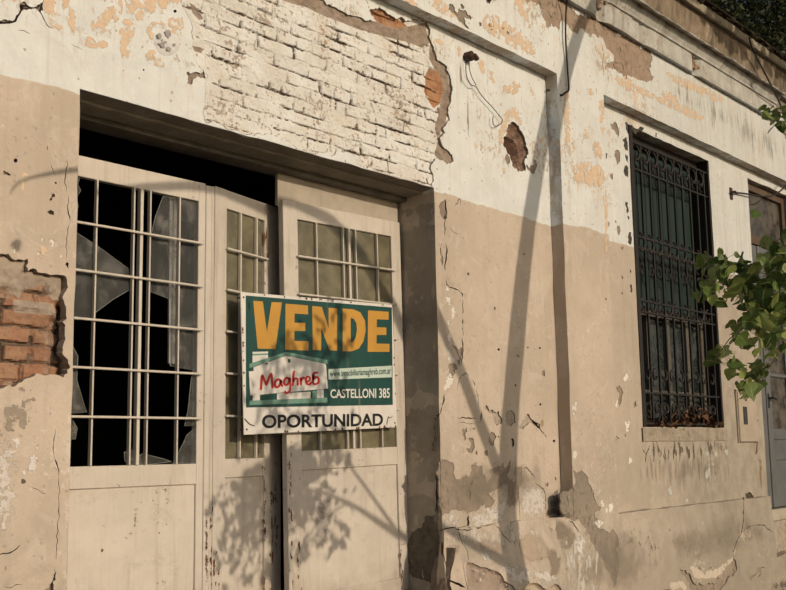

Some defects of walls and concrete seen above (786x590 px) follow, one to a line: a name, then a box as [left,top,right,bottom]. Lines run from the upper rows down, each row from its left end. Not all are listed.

crack [0,0,51,34]
flaking render [85,0,453,187]
peeling [432,0,723,121]
flaking render [0,245,70,436]
crack [30,429,60,554]
corrosion [205,507,220,586]
corrosion [262,466,278,567]
peeling [407,405,544,583]
crack [435,467,546,590]
peeling [545,466,621,588]
water stain [653,441,724,461]
crack [733,497,772,555]